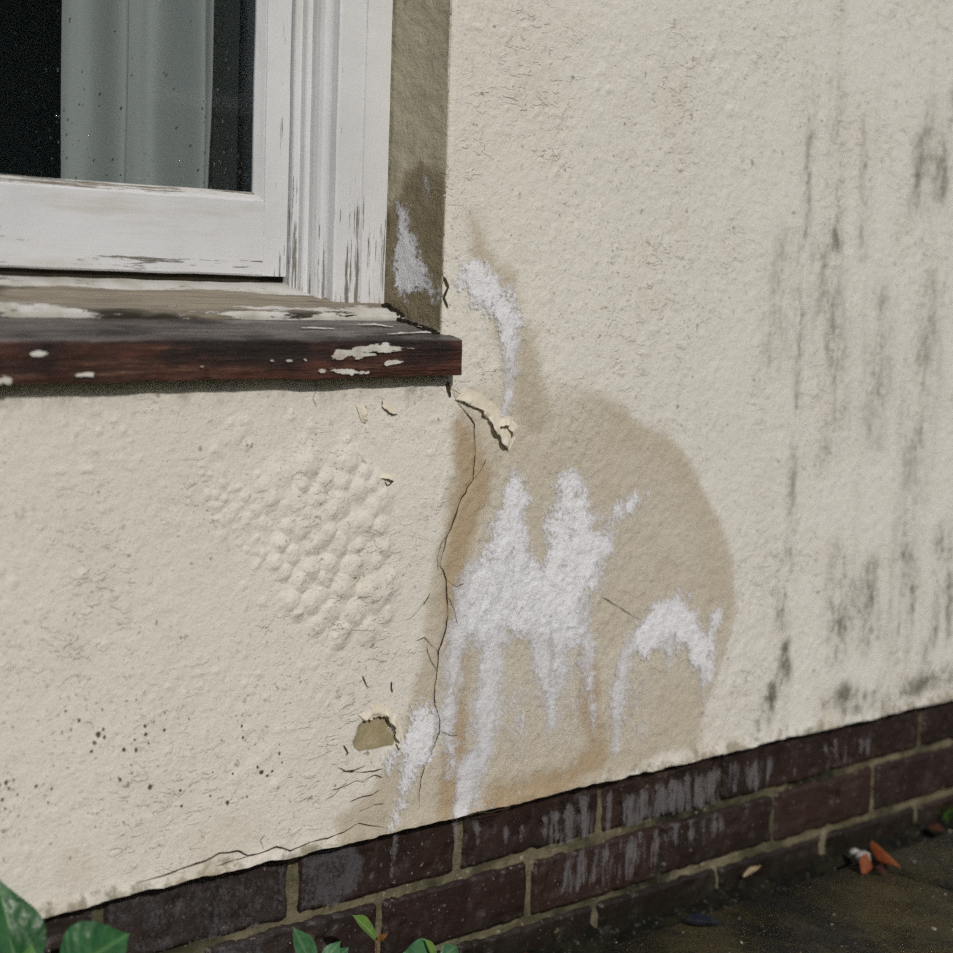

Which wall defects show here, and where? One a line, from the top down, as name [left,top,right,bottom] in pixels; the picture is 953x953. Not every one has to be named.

leakage [386,164,544,424]
peeling [319,323,439,375]
peeling [456,387,518,450]
crack [409,381,486,801]
spalling [344,703,404,756]
leakage [302,403,736,906]
leakage [766,641,791,709]
leakage [835,686,875,712]
crack [133,765,381,885]